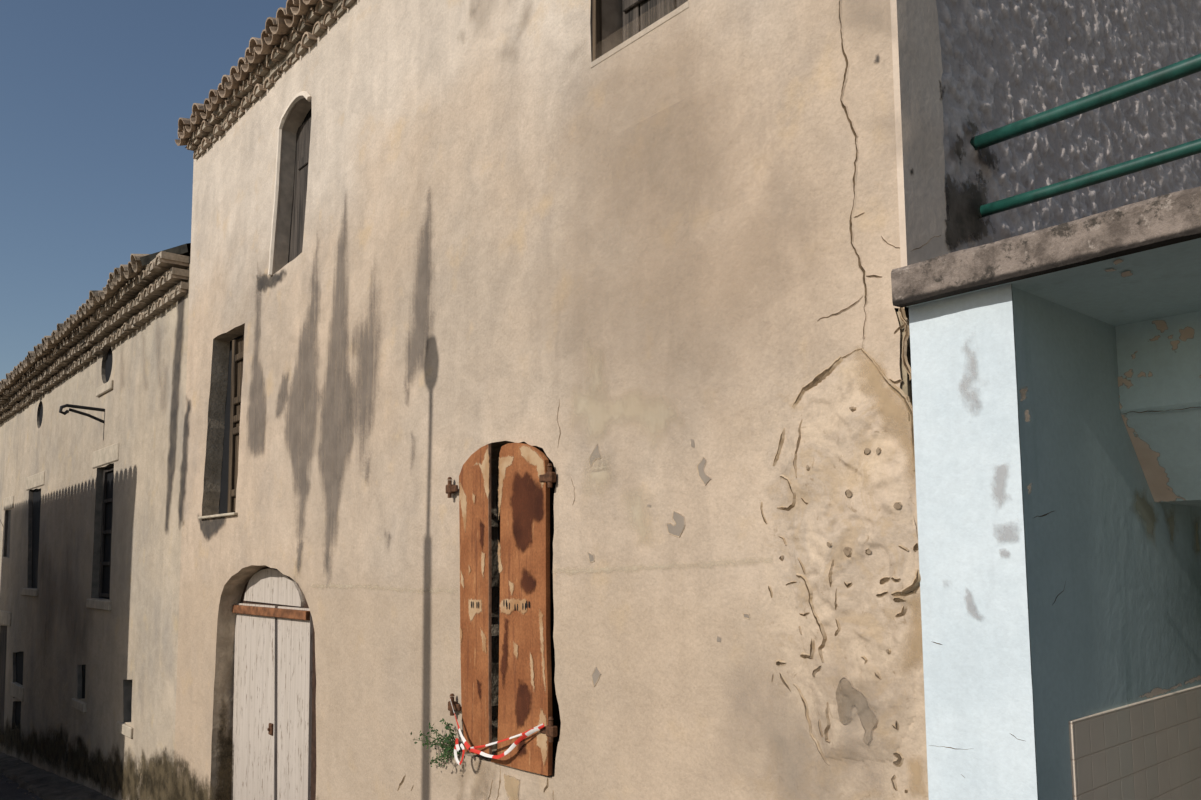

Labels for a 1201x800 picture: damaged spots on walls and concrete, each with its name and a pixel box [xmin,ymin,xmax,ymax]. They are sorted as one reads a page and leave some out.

damp [248,211,377,578]
damp [408,197,431,381]
crack [760,0,941,766]
peeling [1118,351,1185,502]